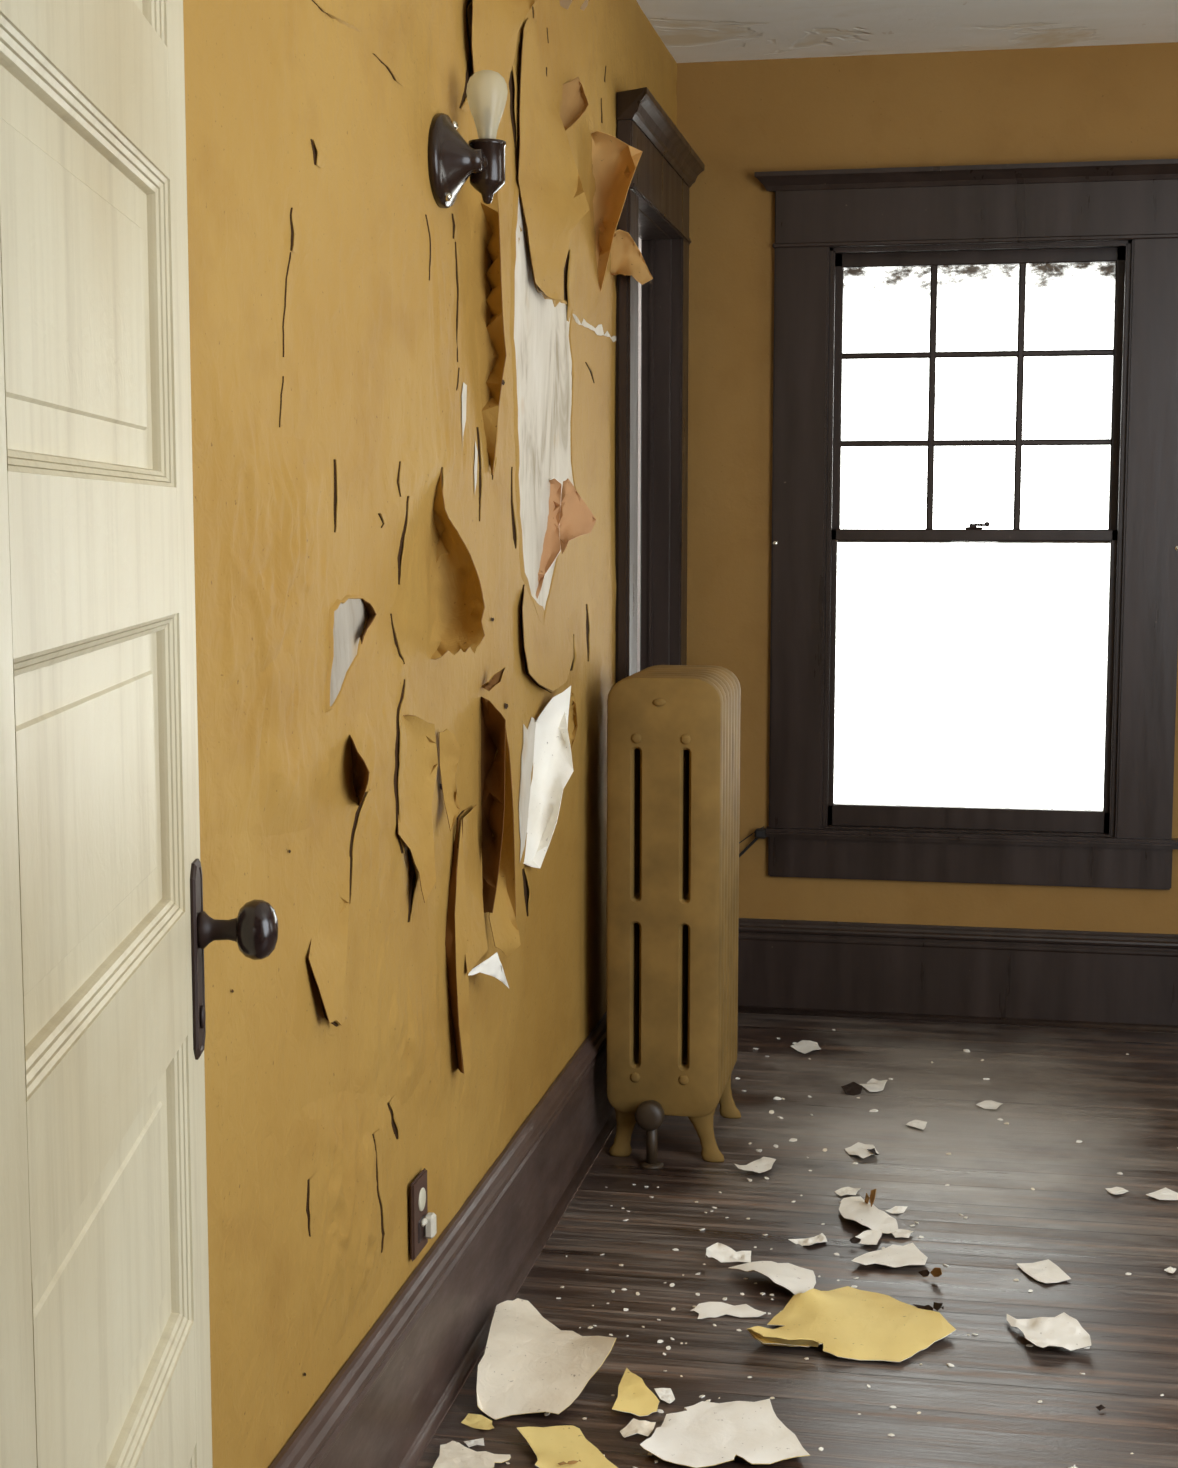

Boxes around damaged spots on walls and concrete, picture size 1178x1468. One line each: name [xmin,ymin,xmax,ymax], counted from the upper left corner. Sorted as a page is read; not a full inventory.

crack [312,0,403,86]
crack [279,208,301,427]
flaking render [398,0,653,1074]
flaking render [325,595,377,713]
peeling [350,735,370,806]
peeling [308,856,350,1025]
crack [372,1095,407,1253]